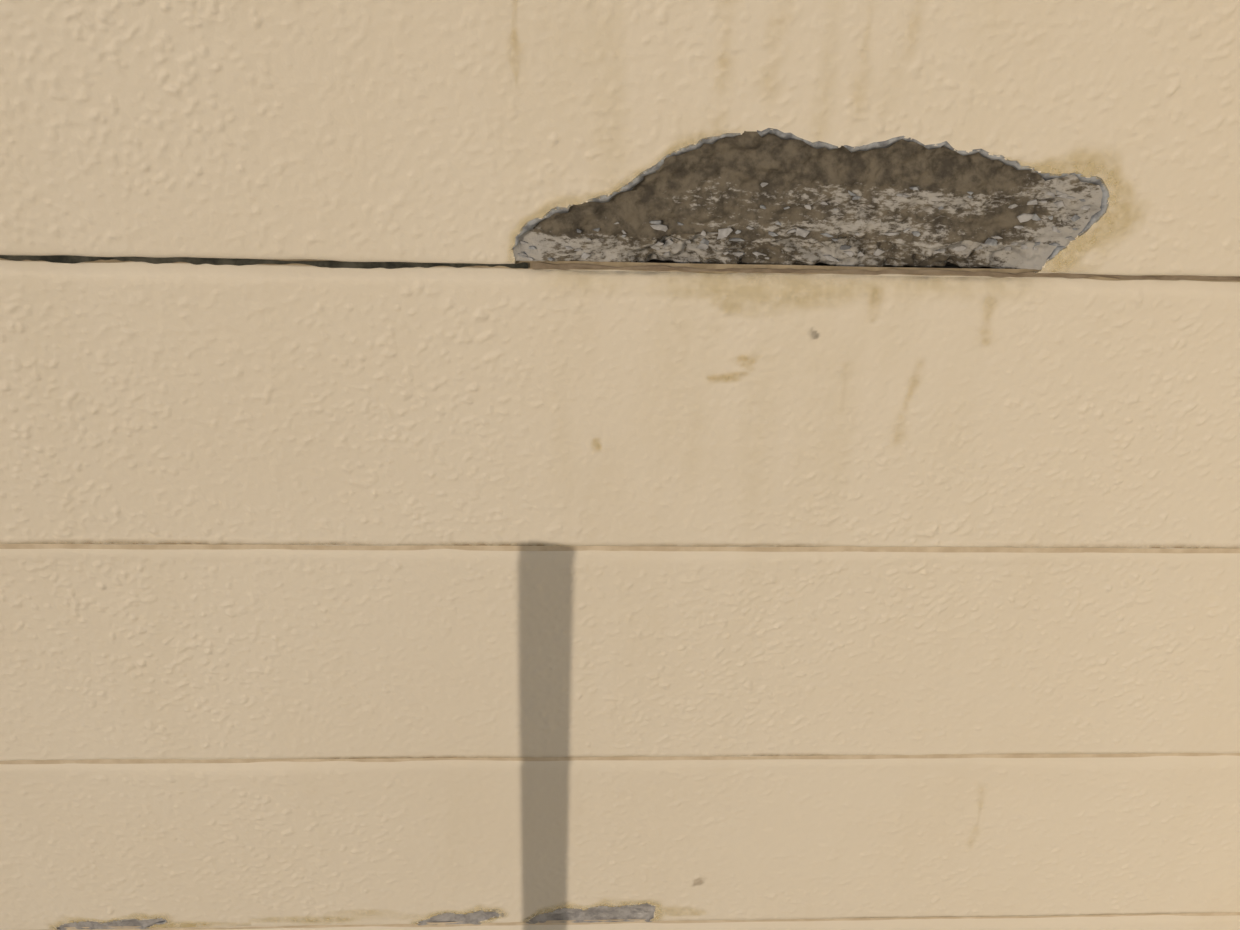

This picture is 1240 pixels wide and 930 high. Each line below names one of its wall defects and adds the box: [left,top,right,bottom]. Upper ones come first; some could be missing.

spalling [511,128,1110,270]
peeling [56,918,168,930]
peeling [417,908,504,925]
peeling [526,903,656,924]